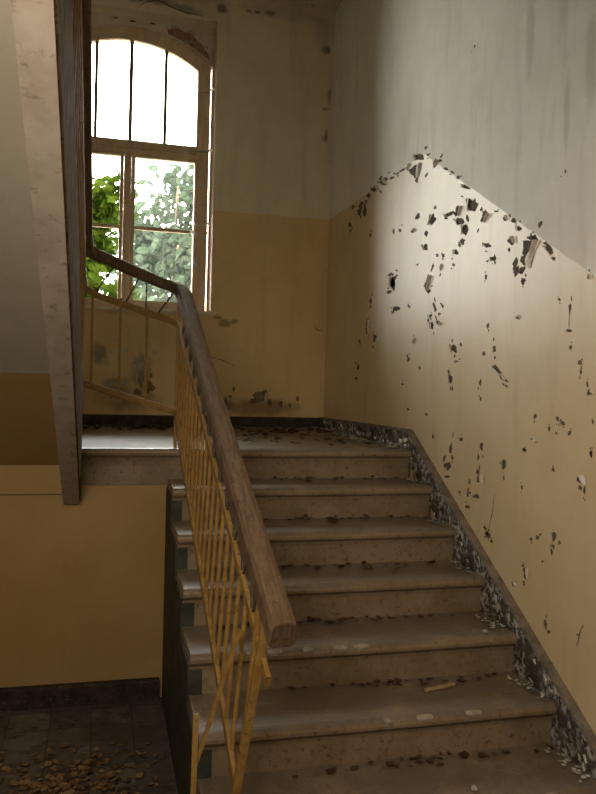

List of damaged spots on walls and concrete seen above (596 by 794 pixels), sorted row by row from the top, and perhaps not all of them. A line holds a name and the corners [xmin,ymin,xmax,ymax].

spalling [167,25,209,60]
peeling [351,146,556,334]
peeling [448,339,462,391]
peeling [482,323,508,388]
peeling [250,389,299,408]
peeling [440,432,463,478]
peeling [458,443,484,508]
peeling [530,532,561,555]